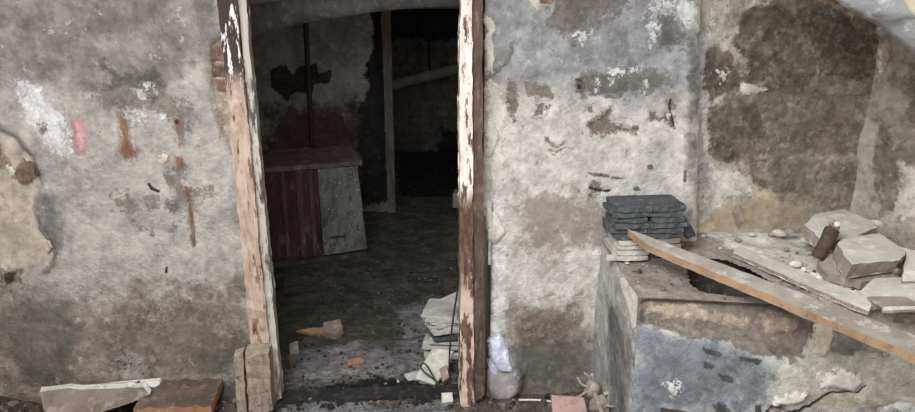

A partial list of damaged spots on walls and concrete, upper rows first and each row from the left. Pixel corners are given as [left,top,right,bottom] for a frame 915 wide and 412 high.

rust [117,112,136,158]
flaking render [271,63,332,101]
peeling [575,64,673,138]
leakage [706,0,879,233]
spalling [0,126,58,288]
rust [183,186,196,247]
spalling [620,277,865,365]
crack [766,385,867,412]